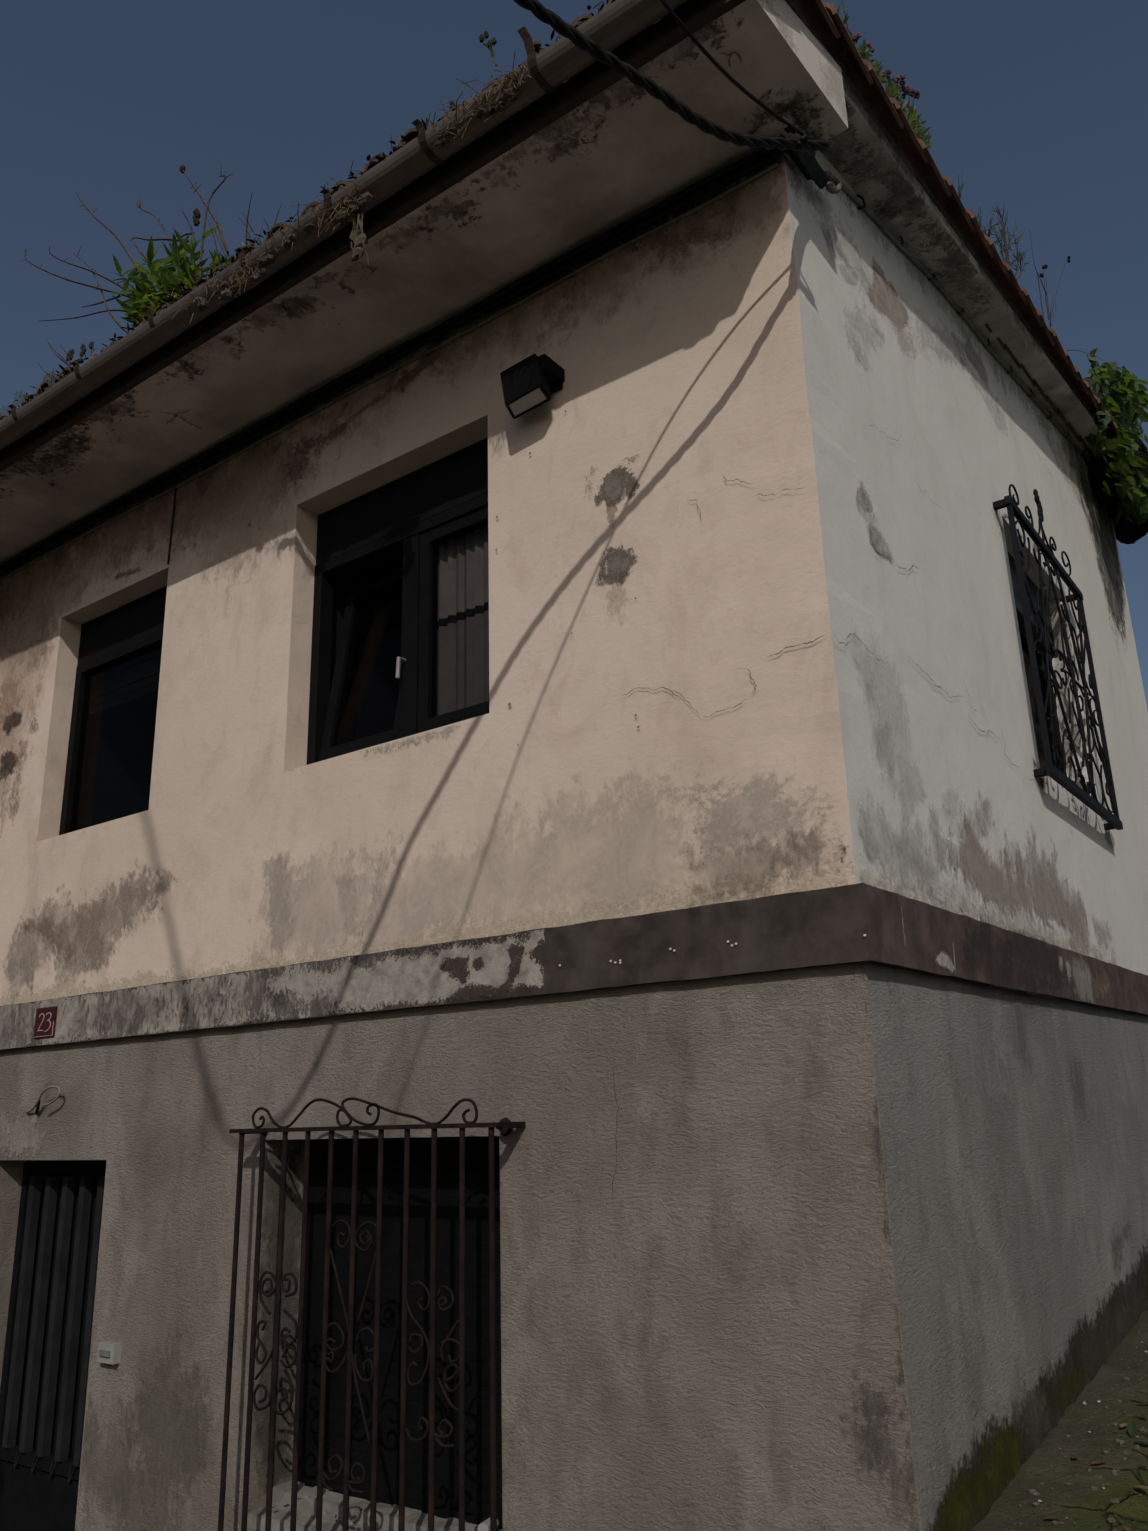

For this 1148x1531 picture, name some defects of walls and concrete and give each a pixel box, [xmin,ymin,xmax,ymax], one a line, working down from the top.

spalling [804,177,989,385]
damp [823,51,1043,360]
spalling [584,454,640,599]
spalling [856,482,893,563]
crack [622,633,1043,785]
peeling [0,929,545,1049]
damp [0,778,1117,1006]
peeling [898,826,1111,1007]